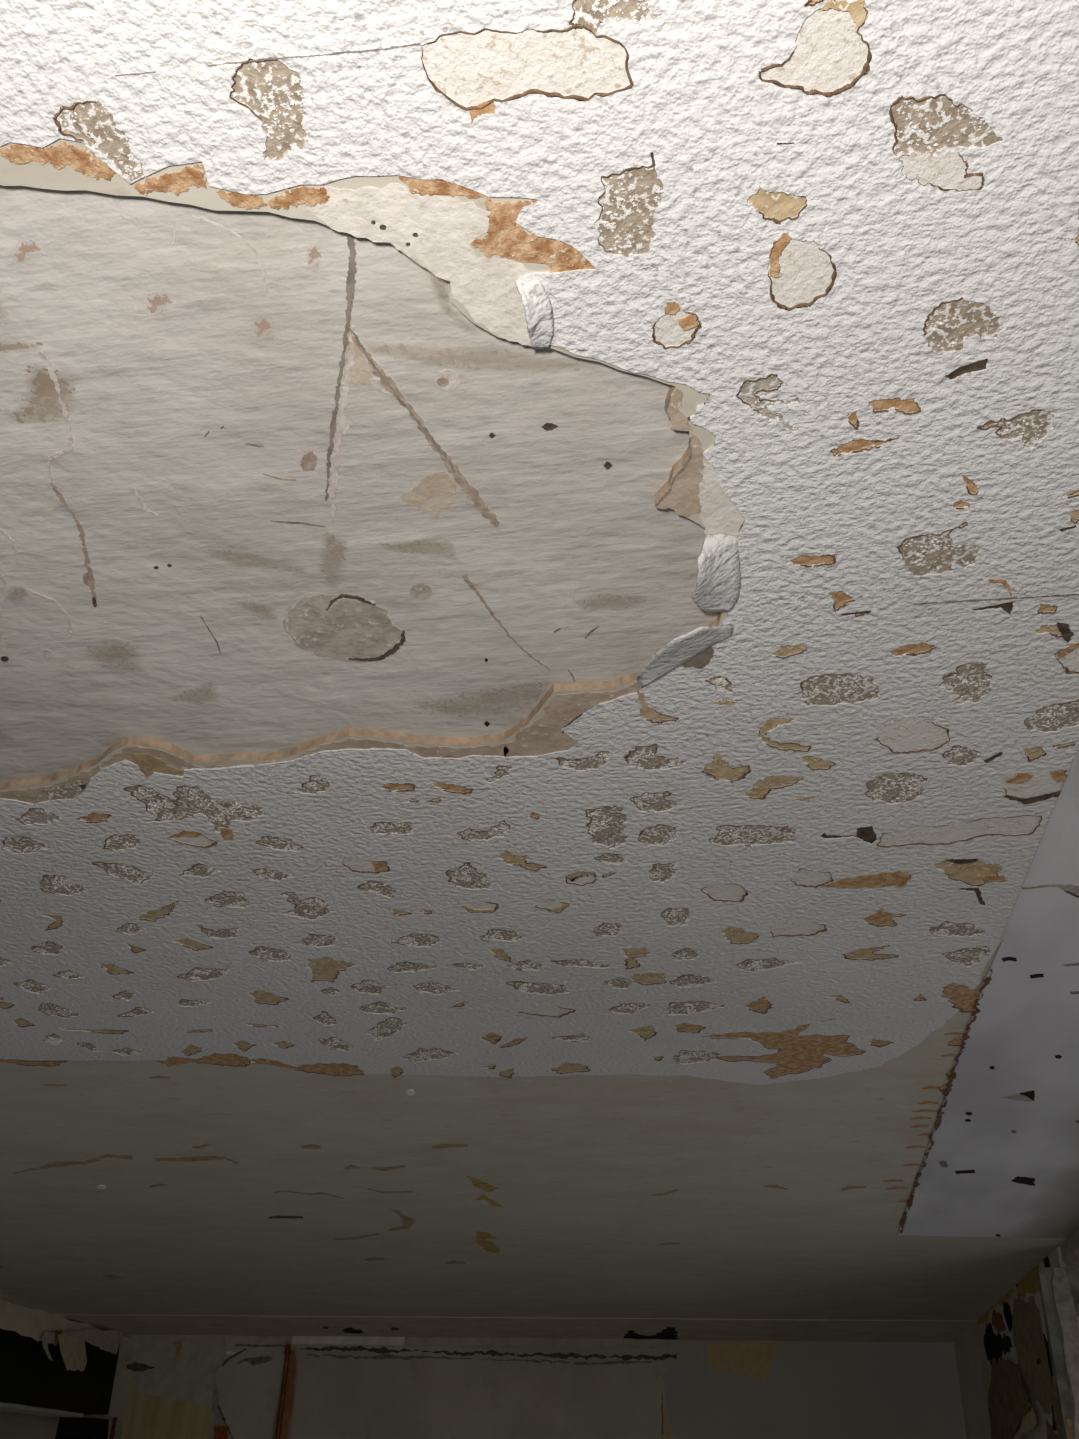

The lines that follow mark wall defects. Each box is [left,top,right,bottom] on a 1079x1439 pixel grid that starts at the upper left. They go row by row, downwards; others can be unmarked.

crack [115,70,156,78]
crack [209,43,421,67]
peeling [306,183,535,345]
peeling [652,302,702,350]
crack [325,234,499,527]
spalling [283,592,406,662]
peeling [701,718,836,801]
peeling [877,742,1075,886]
peeling [791,868,913,889]
peeling [149,1023,364,1079]
peeling [675,1019,894,1079]
flaking render [0,1299,131,1355]